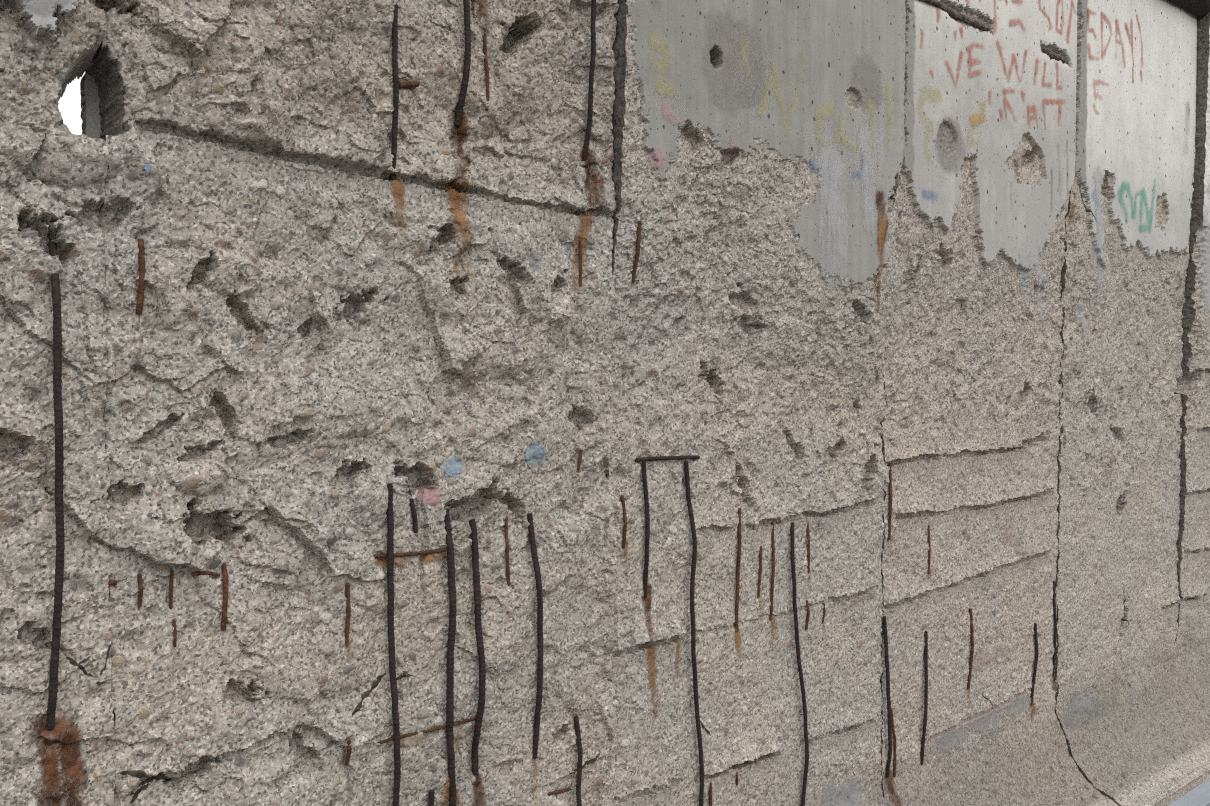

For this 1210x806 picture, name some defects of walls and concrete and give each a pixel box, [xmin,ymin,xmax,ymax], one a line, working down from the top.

rust [386,178,405,226]
rust [442,113,472,274]
rust [875,191,889,310]
spalling [0,0,619,806]
spalling [606,0,1210,806]
rust [642,583,657,705]
rust [30,715,88,806]
rust [474,774,485,806]
rust [885,771,901,806]